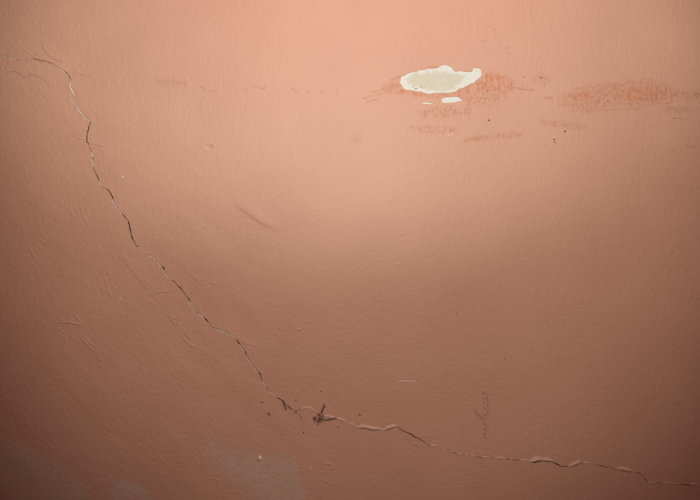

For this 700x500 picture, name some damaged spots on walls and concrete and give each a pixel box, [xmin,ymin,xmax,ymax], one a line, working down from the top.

peeling [399,64,483,105]
crack [0,42,318,425]
crack [324,415,700,488]